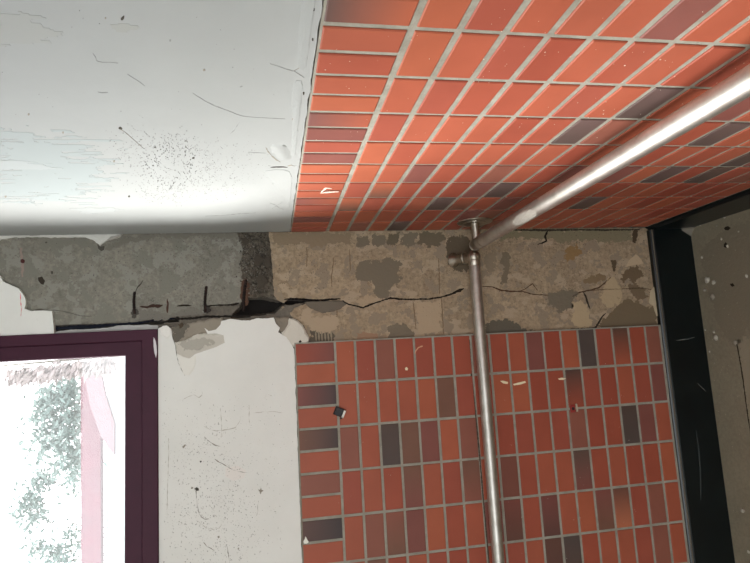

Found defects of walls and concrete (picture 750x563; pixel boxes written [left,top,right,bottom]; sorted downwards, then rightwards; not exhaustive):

rust [131,299,169,318]
crack [54,303,252,372]
peeling [0,229,488,358]
crack [482,283,547,296]
peeling [477,227,653,331]
crack [572,277,611,329]